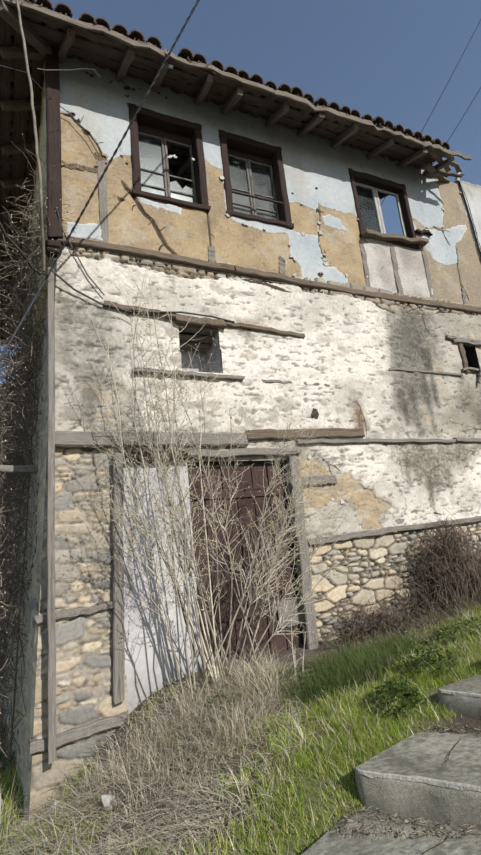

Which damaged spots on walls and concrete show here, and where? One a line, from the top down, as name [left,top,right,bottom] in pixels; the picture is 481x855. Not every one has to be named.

crack [62,113,102,154]
crack [122,183,173,254]
peeling [60,111,481,316]
water stain [394,315,438,415]
water stain [395,443,480,502]